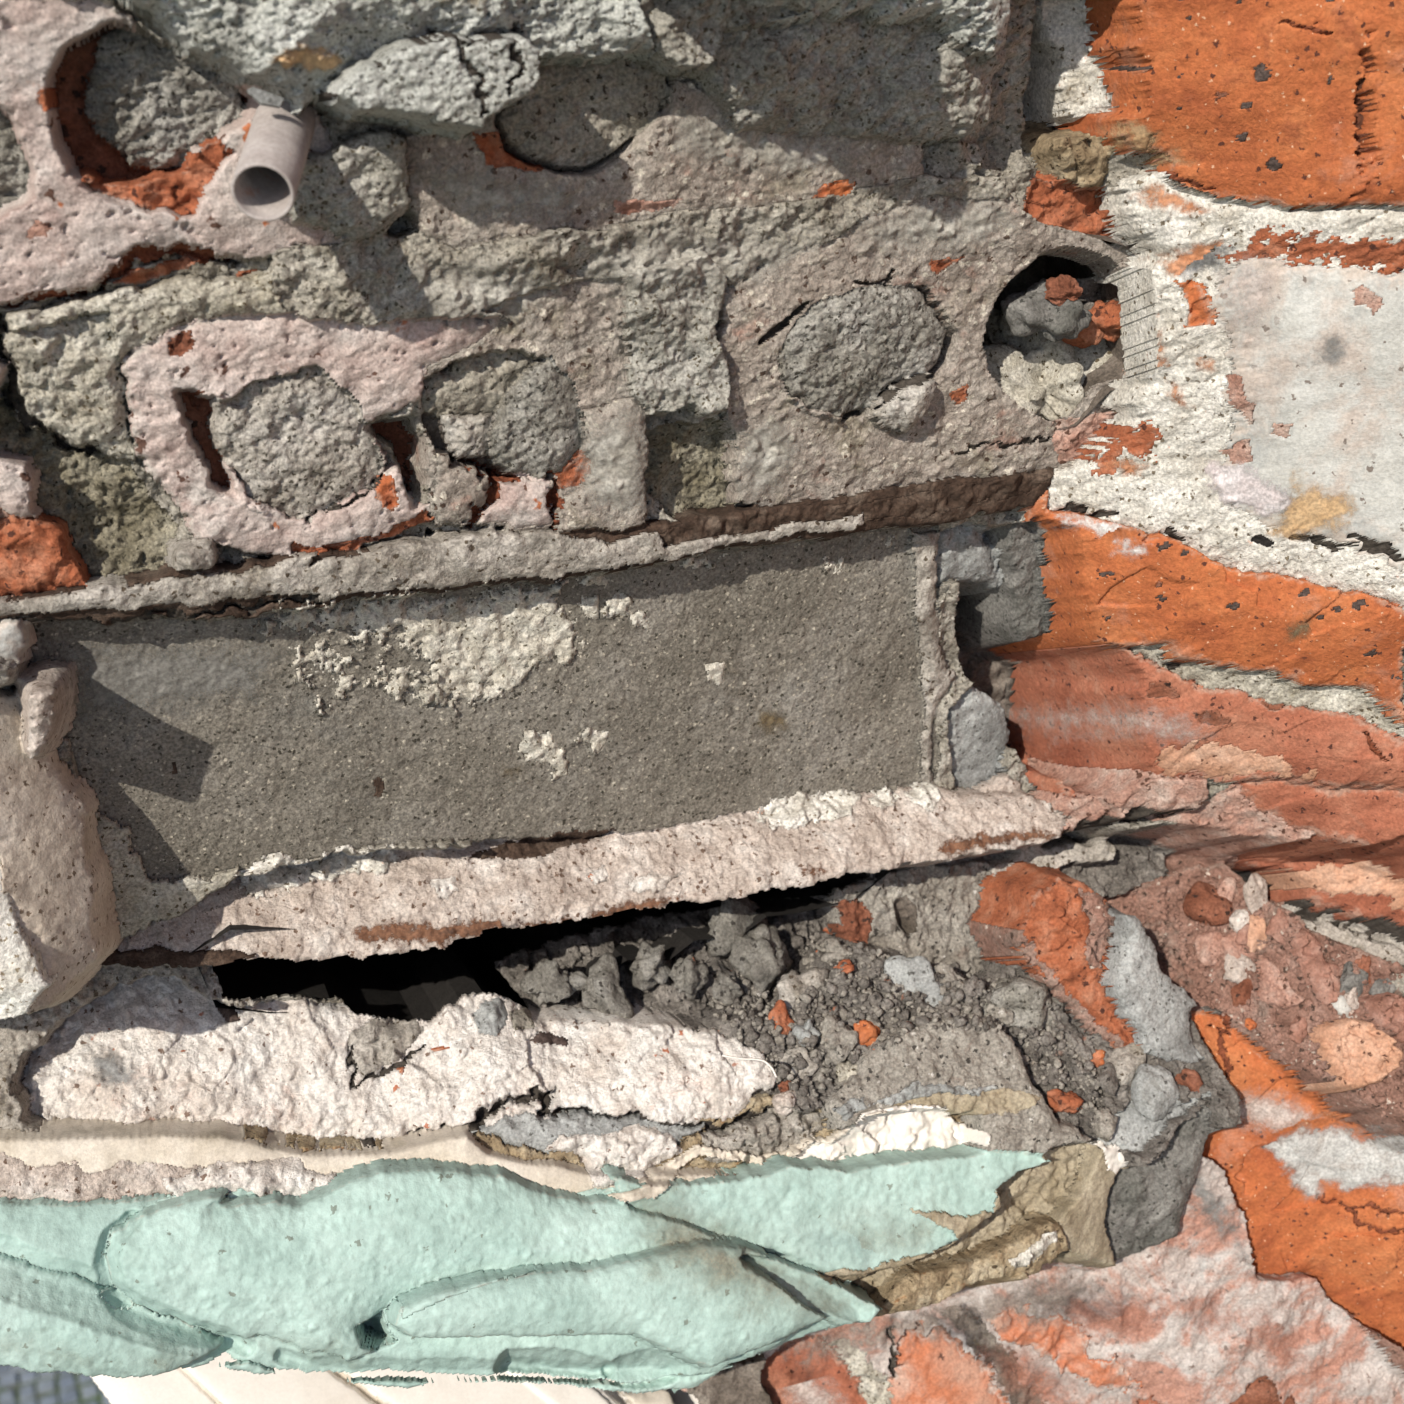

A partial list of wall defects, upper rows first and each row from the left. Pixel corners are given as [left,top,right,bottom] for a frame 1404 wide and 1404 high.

spalling [1023,171,1118,242]
crack [758,301,810,344]
crack [853,268,895,287]
spalling [1173,280,1220,328]
spalling [1215,224,1404,316]
crack [841,373,932,421]
crack [955,435,1053,455]
spalling [1074,419,1163,477]
spalling [0,512,91,597]
spalling [743,869,893,944]
spalling [192,900,722,1023]
peeling [607,1011,1129,1317]